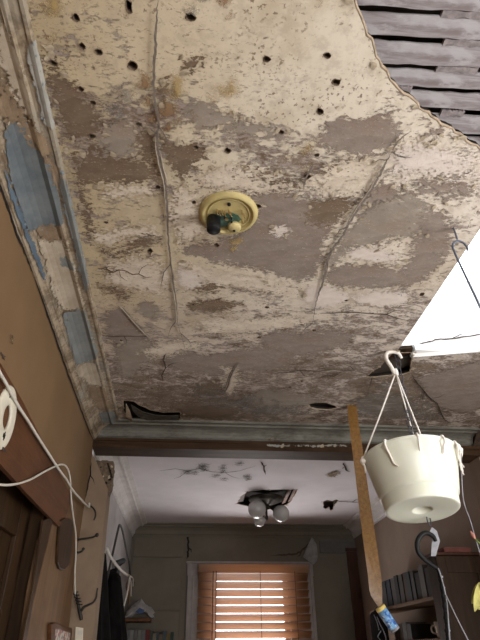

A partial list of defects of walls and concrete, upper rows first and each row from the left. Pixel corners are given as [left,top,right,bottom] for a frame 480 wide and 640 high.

flaking render [344,0,480,150]
peeling [0,38,213,277]
crack [99,4,191,348]
crack [303,131,411,331]
flaking render [366,345,416,378]
peeling [87,381,239,421]
flaking render [307,402,337,411]
water stain [343,382,445,421]
crack [412,375,452,423]
crack [161,462,266,479]
flaking render [236,489,298,506]